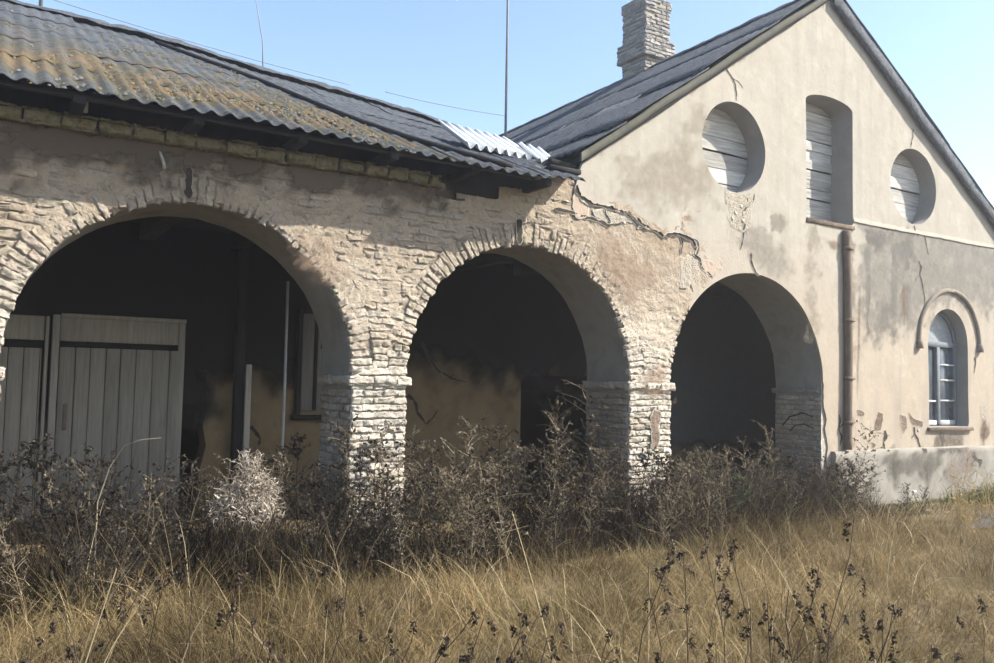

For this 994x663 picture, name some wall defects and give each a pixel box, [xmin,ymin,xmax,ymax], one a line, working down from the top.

crack [726,69,743,100]
spalling [572,193,639,230]
crack [555,185,713,278]
spalling [724,189,754,233]
crack [914,226,929,306]
damp [859,224,994,352]
crack [406,393,438,425]
crack [782,412,814,431]
crack [838,415,854,473]
spalling [856,409,884,449]
spalling [899,412,923,434]